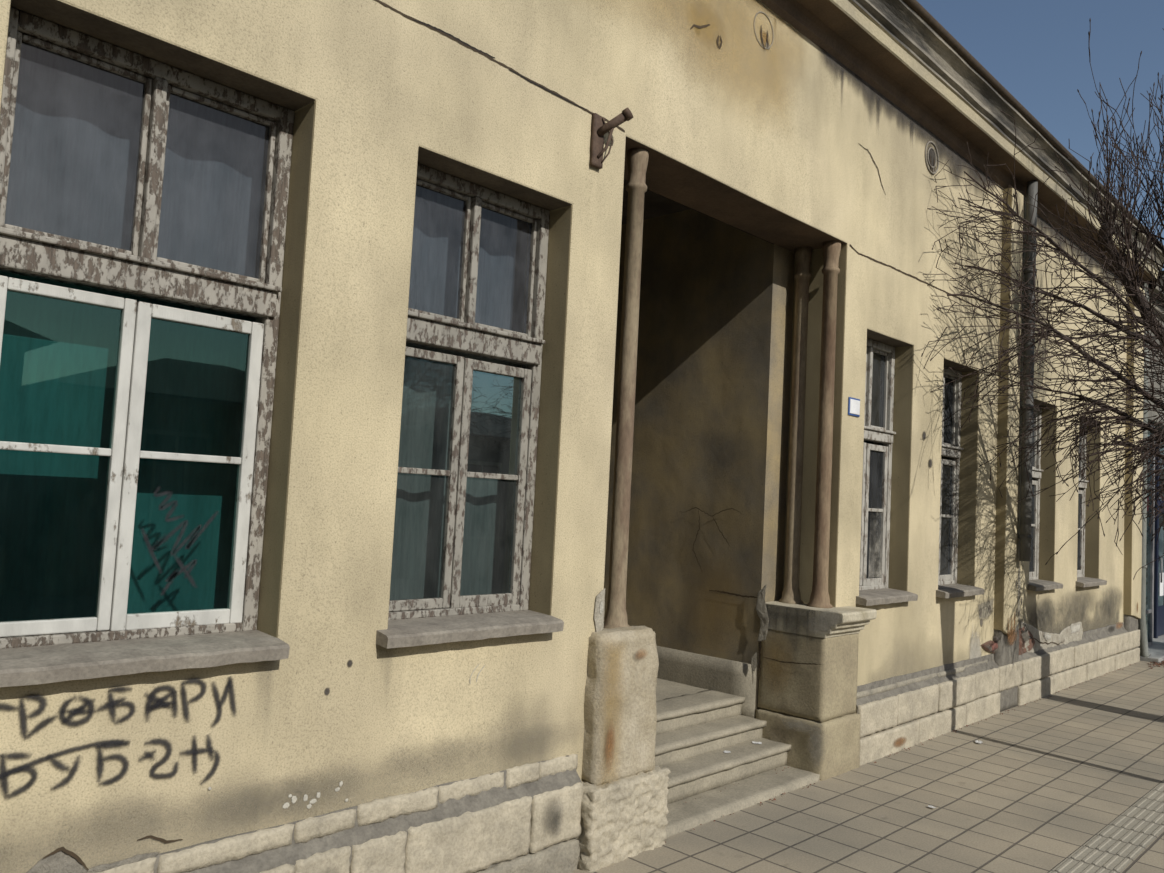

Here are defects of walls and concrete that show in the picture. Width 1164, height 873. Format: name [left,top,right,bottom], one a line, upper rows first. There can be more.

leakage [822,48,995,186]
crack [686,507,757,598]
spalling [751,585,769,671]
crack [759,641,821,676]
peeling [978,600,993,626]
peeling [1016,568,1083,653]